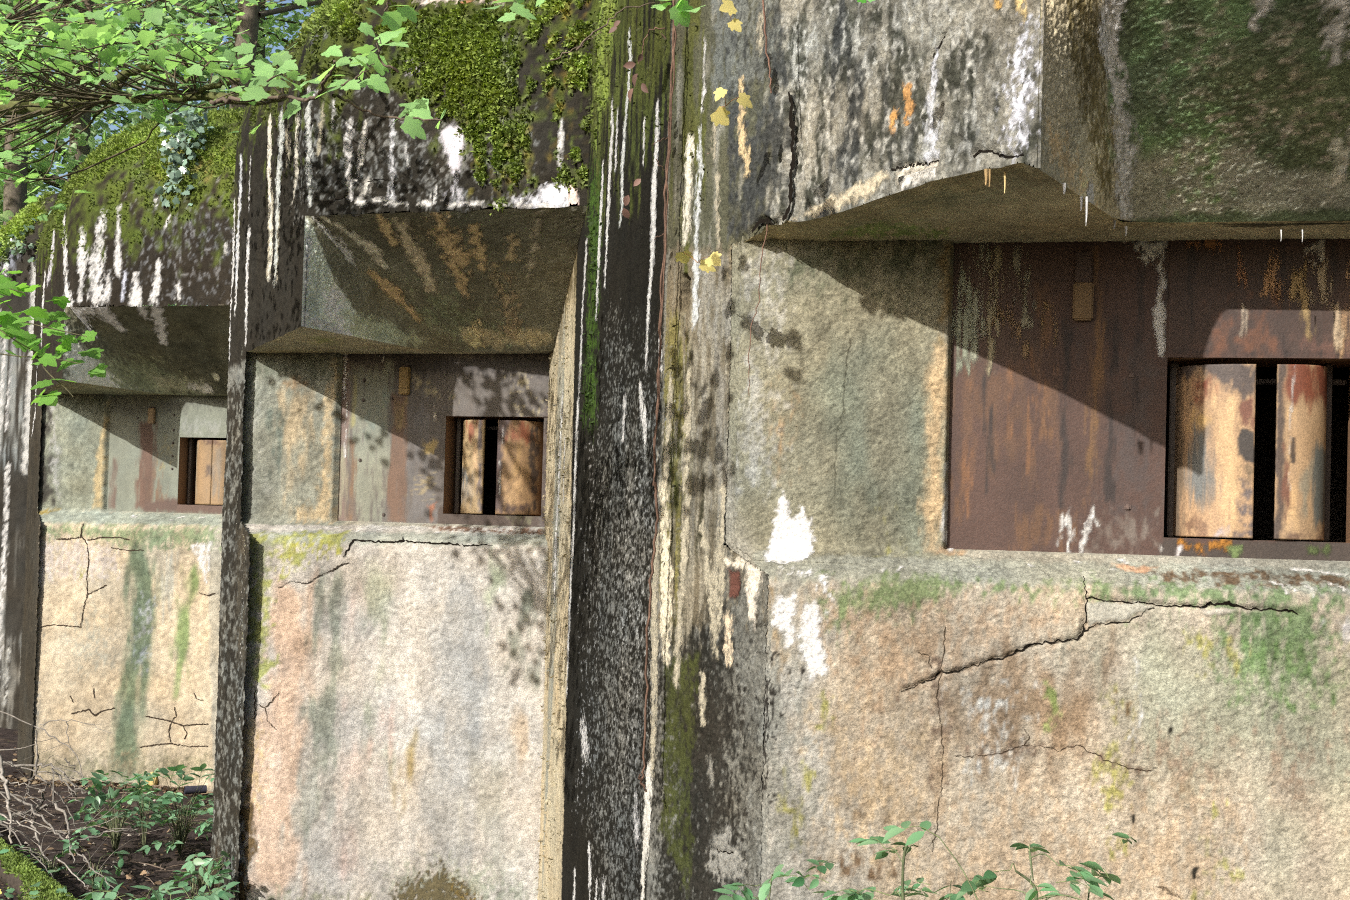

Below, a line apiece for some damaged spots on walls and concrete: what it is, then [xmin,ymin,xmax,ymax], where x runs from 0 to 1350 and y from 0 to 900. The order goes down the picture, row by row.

water stain [29,206,168,345]
water stain [553,31,632,696]
corrosion [952,243,1047,375]
corrosion [1240,303,1248,335]
corrosion [1264,260,1348,357]
crack [42,523,141,627]
crack [278,537,489,588]
water stain [634,102,733,900]
water stain [746,491,833,679]
corrosion [1161,538,1242,558]
crack [140,694,208,748]
crack [901,576,1298,850]